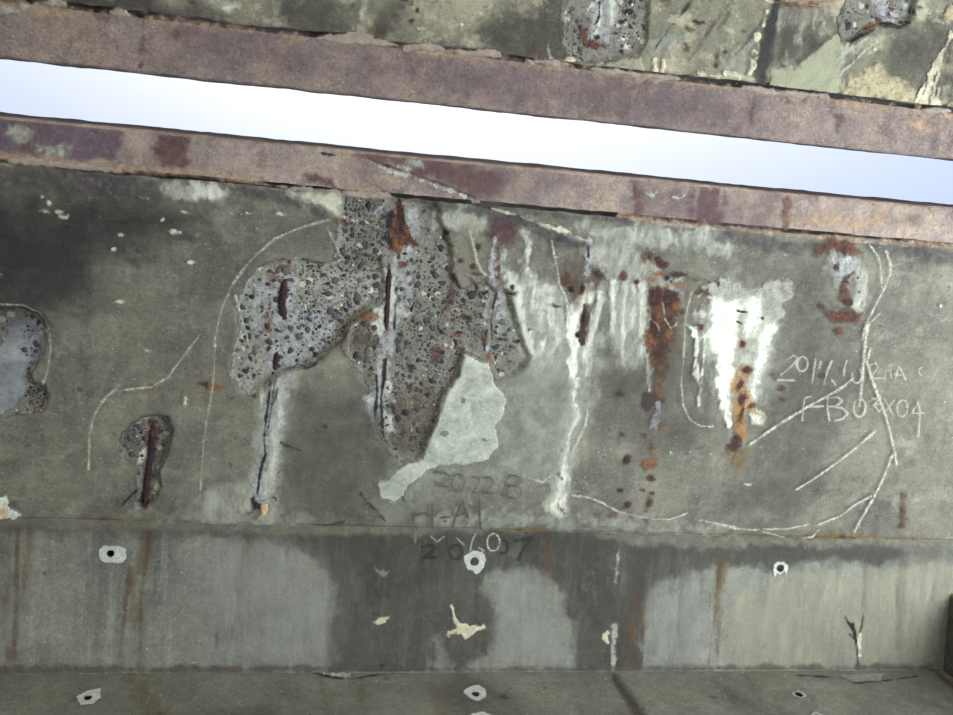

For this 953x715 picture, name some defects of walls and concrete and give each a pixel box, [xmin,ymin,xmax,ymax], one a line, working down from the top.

spalling [561,0,686,73]
peeling [697,0,780,80]
peeling [770,0,923,102]
leakage [0,166,342,312]
rust [560,260,637,346]
rust [783,197,884,335]
spalling [120,415,174,513]
spalling [229,193,571,519]
leakage [0,203,953,715]
rust [585,252,711,532]
rust [728,366,756,466]
crack [798,618,918,683]